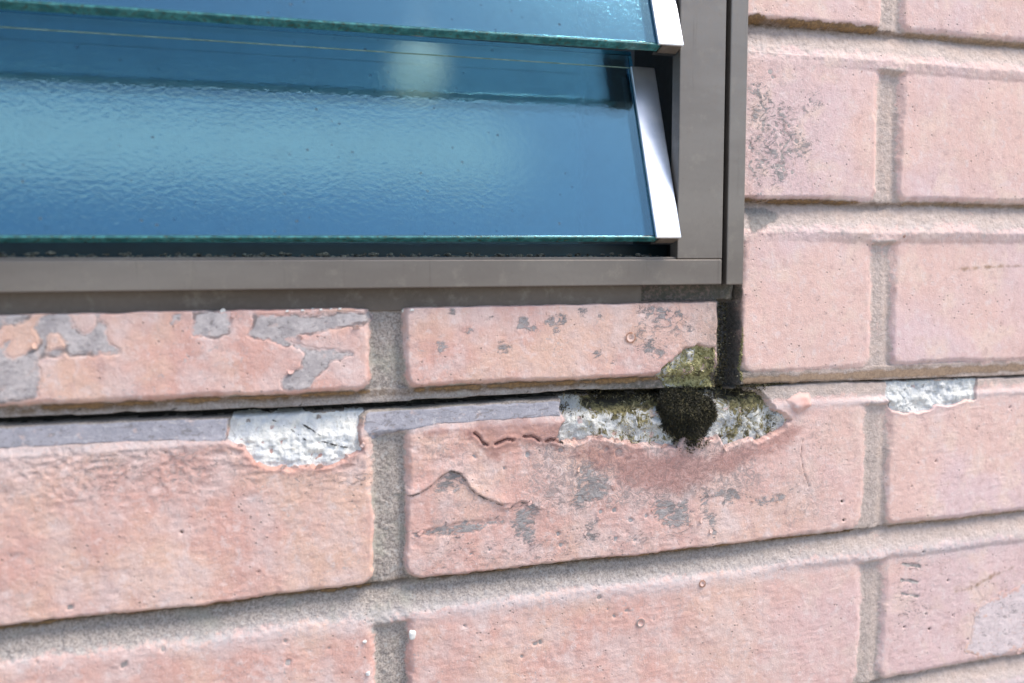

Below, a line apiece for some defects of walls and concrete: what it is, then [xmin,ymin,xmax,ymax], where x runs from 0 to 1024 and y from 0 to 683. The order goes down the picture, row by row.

peeling [0,312,121,404]
peeling [169,309,236,339]
peeling [246,308,373,391]
crack [0,389,587,423]
flaking render [0,389,677,493]
flaking render [695,385,786,451]
flaking render [882,377,975,413]